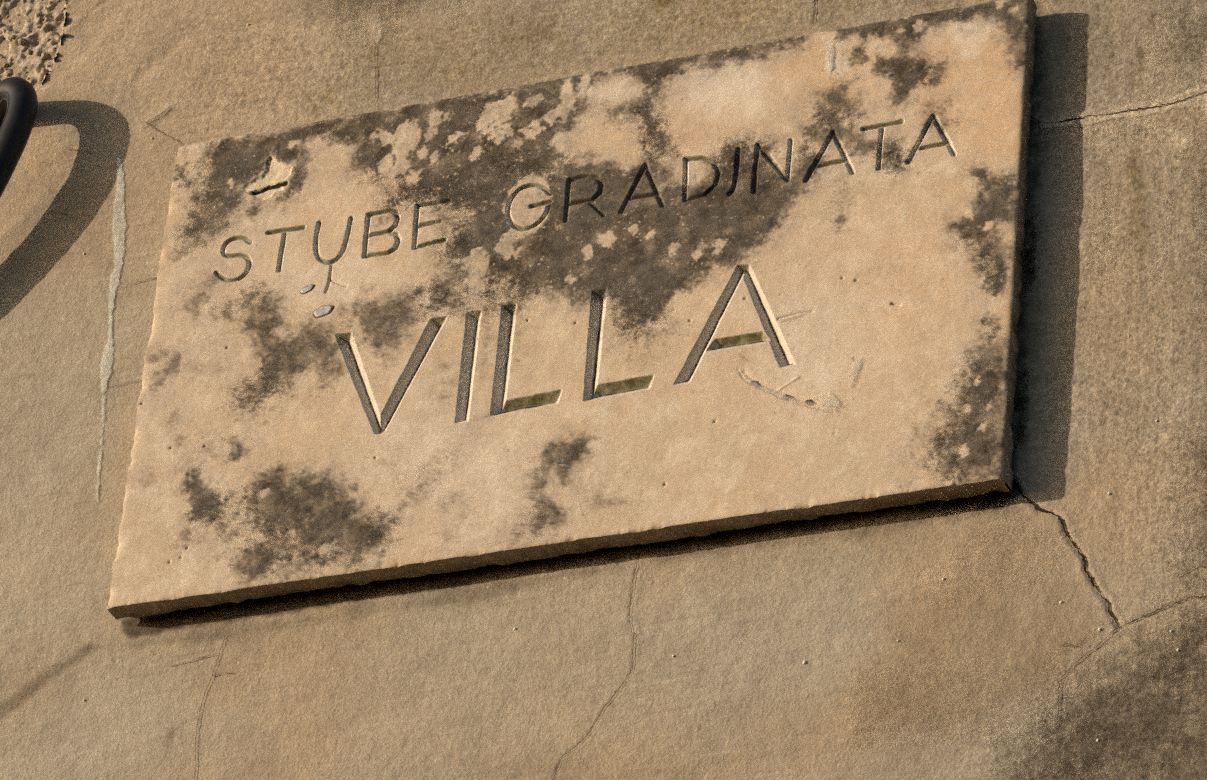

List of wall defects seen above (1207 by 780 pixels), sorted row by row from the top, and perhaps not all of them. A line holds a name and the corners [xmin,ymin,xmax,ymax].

crack [1038,91,1207,123]
water stain [1040,84,1207,129]
water stain [1158,128,1194,152]
water stain [96,397,105,501]
crack [170,635,228,780]
water stain [123,480,1021,636]
crack [554,551,638,779]
crack [1012,483,1207,738]
water stain [1063,651,1207,780]